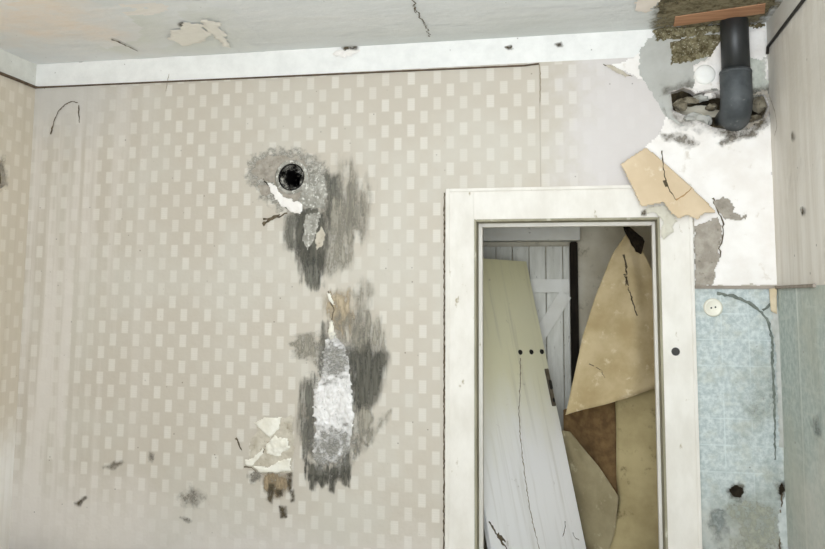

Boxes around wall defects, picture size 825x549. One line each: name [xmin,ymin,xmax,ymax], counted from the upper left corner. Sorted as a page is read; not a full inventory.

peeling [149,0,267,56]
peeling [634,0,660,13]
flaking render [638,35,770,134]
flaking render [246,148,328,226]
peeling [315,227,325,249]
peeling [641,206,677,239]
crack [712,198,724,257]
flaking render [694,197,747,286]
crack [717,291,776,460]
peeling [245,417,293,473]
leakage [701,412,825,549]